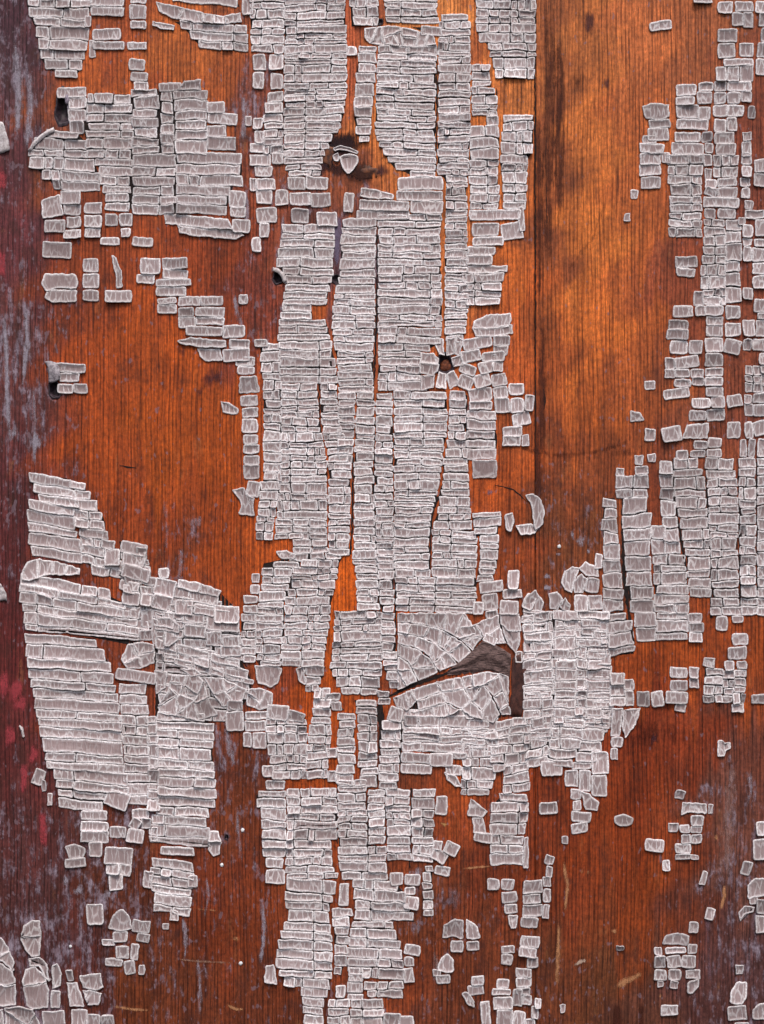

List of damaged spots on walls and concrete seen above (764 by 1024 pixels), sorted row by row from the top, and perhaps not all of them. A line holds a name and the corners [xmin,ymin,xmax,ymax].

peeling [156,2,248,52]
peeling [19,212,356,858]
peeling [240,0,641,1024]
peeling [637,667,699,713]
peeling [703,633,749,713]
peeling [65,844,86,868]
peeling [104,847,133,891]
peeling [142,858,198,921]
peeling [644,790,714,885]
peeling [738,821,764,934]
peeling [654,907,716,994]
peeling [727,965,764,1024]